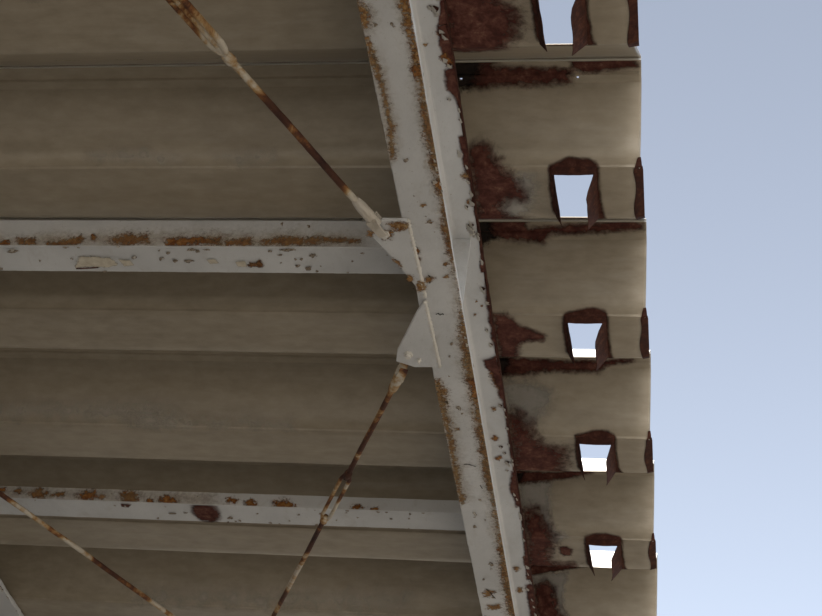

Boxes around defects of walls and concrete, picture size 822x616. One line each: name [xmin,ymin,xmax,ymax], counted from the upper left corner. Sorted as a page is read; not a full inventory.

rust [357,0,397,160]
rust [0,237,36,245]
rust [46,234,97,245]
rust [107,232,150,245]
rust [163,221,409,246]
rust [392,0,643,616]
rust [0,487,106,500]
rust [119,490,177,503]
rust [225,497,257,506]
rust [273,498,297,507]
rust [192,505,220,523]